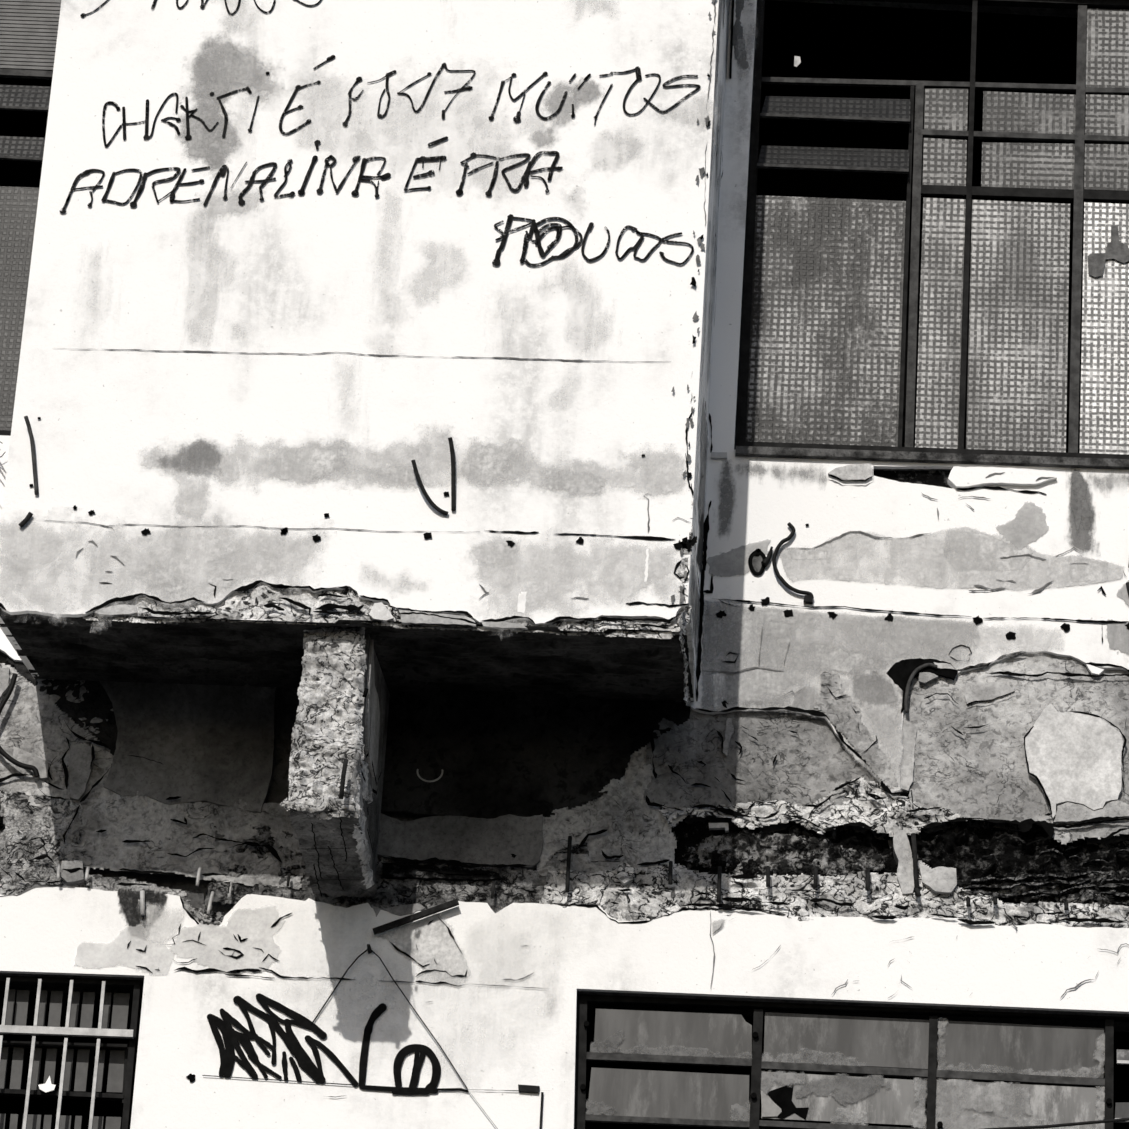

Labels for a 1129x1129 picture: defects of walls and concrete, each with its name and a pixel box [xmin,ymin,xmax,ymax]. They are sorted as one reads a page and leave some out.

leakage [178,42,275,168]
spalling [690,231,705,287]
leakage [0,428,685,618]
leakage [1069,470,1129,552]
spalling [0,371,1129,985]